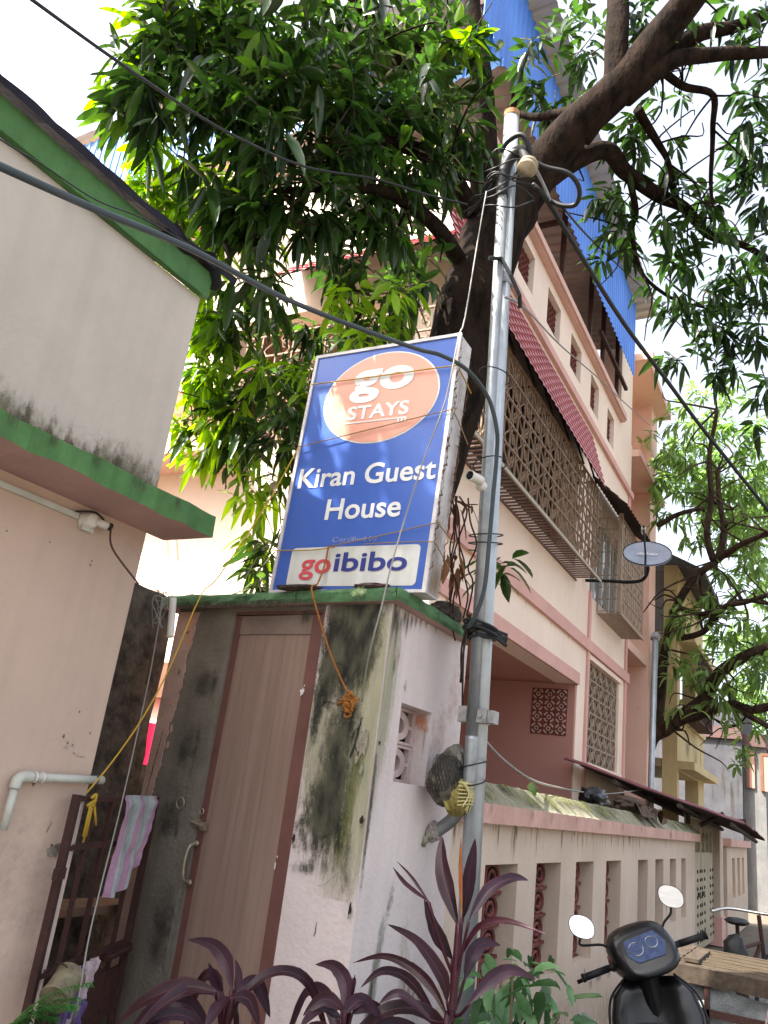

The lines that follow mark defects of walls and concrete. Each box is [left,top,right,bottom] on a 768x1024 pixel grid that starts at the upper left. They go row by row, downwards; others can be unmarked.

leakage [293,604,427,891]